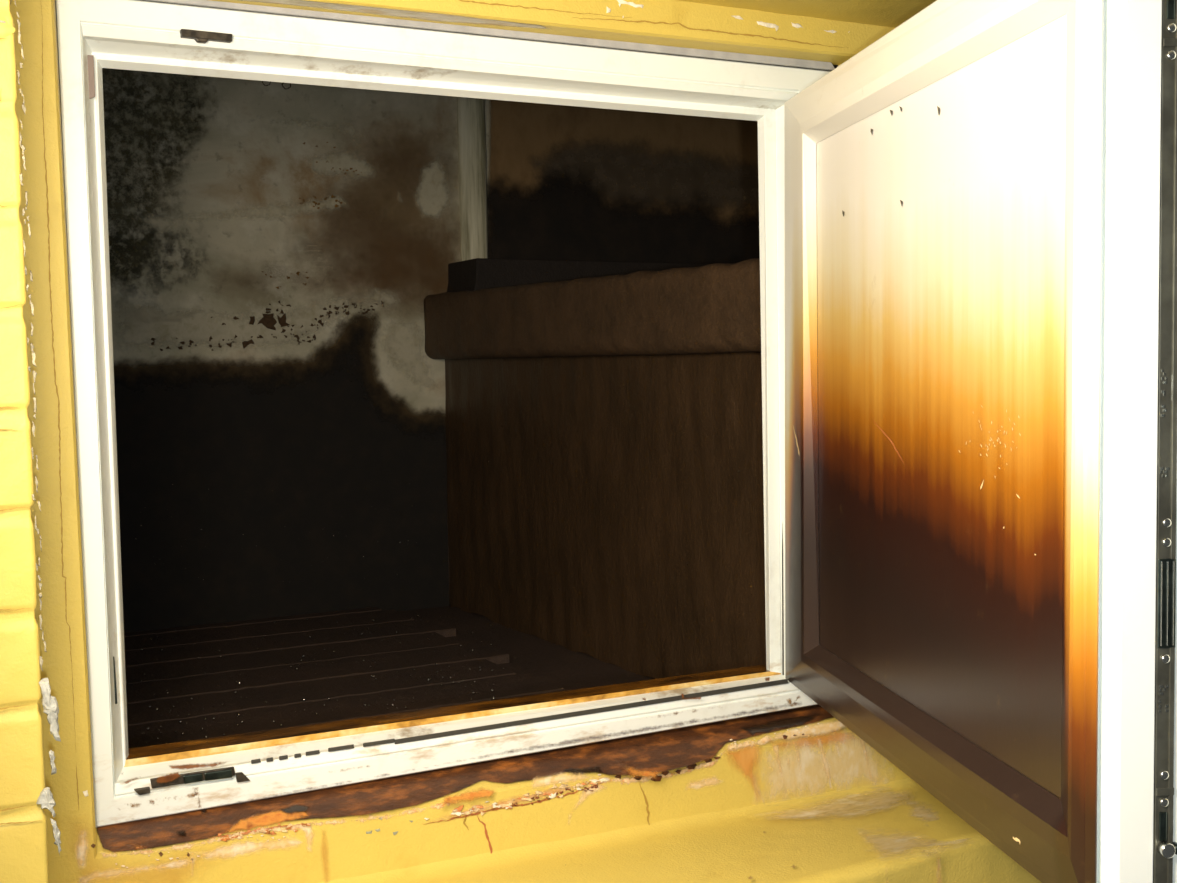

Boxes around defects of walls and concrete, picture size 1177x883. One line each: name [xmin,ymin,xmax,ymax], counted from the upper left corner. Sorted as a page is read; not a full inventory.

peeling [606,0,644,18]
crack [459,0,848,48]
peeling [732,16,803,31]
peeling [0,0,61,855]
crack [0,8,79,810]
leakage [81,697,833,883]
peeling [409,778,610,824]
leakage [779,793,936,821]
leakage [78,835,86,864]
peeling [207,823,311,842]
crack [463,816,492,854]